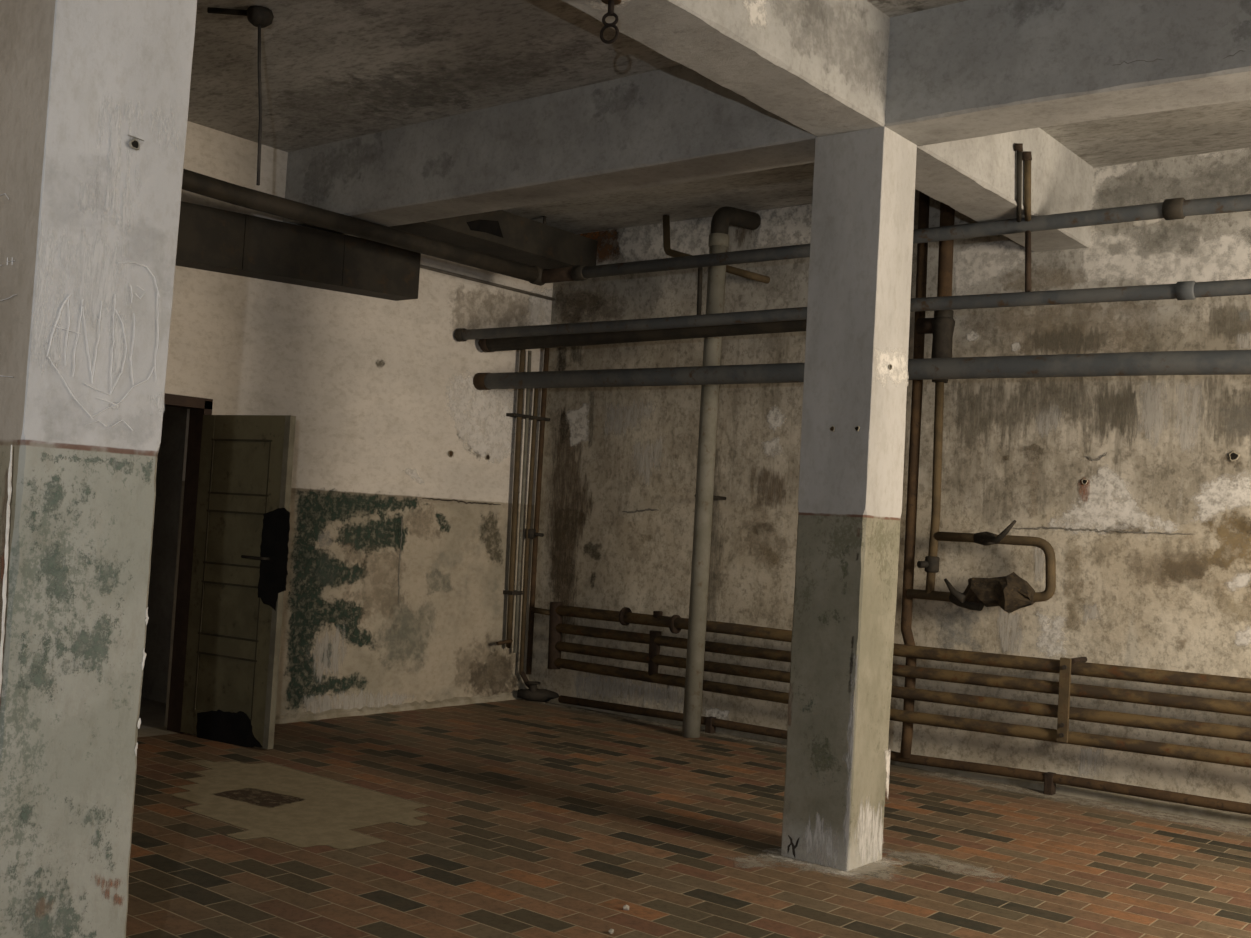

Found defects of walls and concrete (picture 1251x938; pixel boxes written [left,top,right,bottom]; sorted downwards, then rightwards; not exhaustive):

leakage [953,377,1251,448]
leakage [480,515,501,562]
leakage [1161,511,1251,591]
leakage [469,650,517,695]